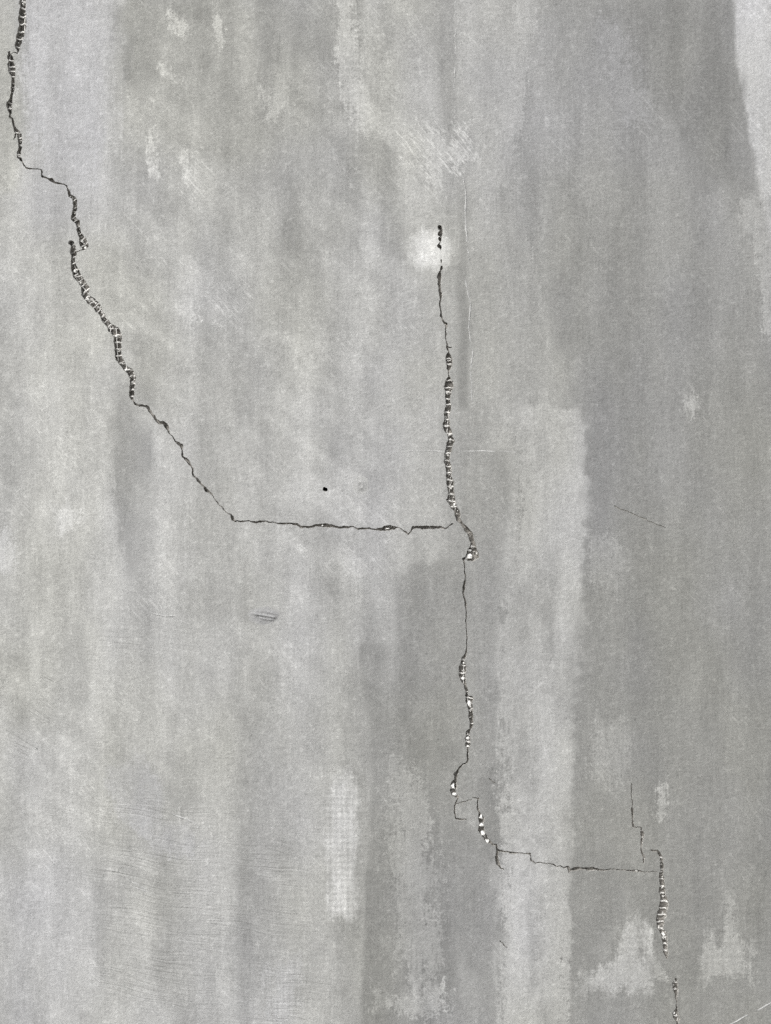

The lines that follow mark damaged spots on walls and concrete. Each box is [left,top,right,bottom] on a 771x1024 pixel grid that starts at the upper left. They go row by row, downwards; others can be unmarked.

crack [6,0,453,535]
crack [437,259,669,959]
crack [672,978,681,1024]